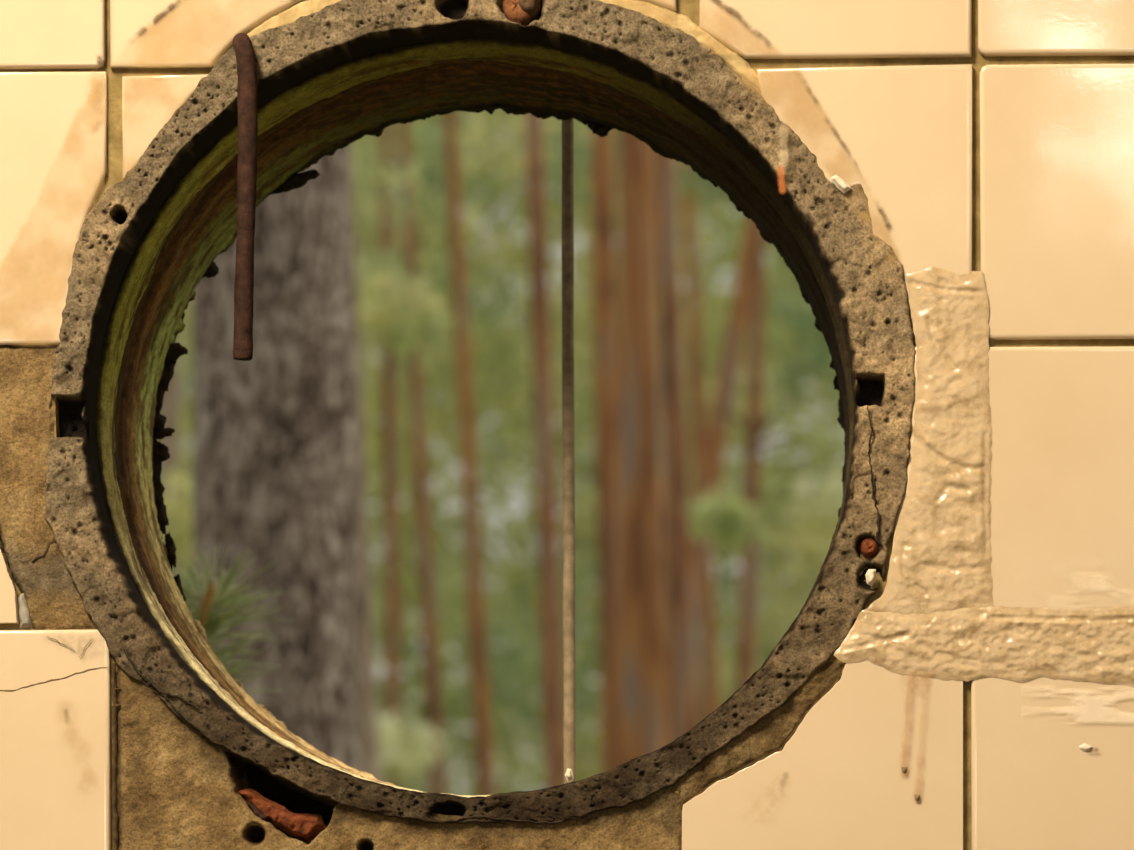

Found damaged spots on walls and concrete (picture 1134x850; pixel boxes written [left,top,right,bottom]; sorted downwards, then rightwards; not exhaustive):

peeling [587,121,612,137]
peeling [274,169,320,194]
peeling [830,175,852,193]
peeling [204,261,219,278]
spalling [0,345,97,630]
peeling [152,343,188,603]
crack [867,406,884,547]
peeling [865,569,877,586]
crack [0,649,208,735]
spalling [111,662,845,850]